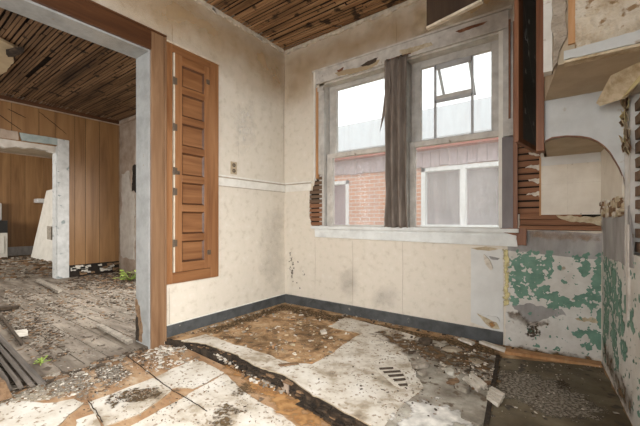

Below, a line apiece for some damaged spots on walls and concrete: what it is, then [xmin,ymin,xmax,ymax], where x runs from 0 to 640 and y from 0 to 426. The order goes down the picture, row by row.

peeling [335,57,380,76]
spalling [518,147,539,209]
flaking render [69,164,136,277]
damp [202,304,345,334]
damp [509,312,549,340]
peeling [477,205,640,418]
crack [129,357,207,411]
damp [360,320,603,426]